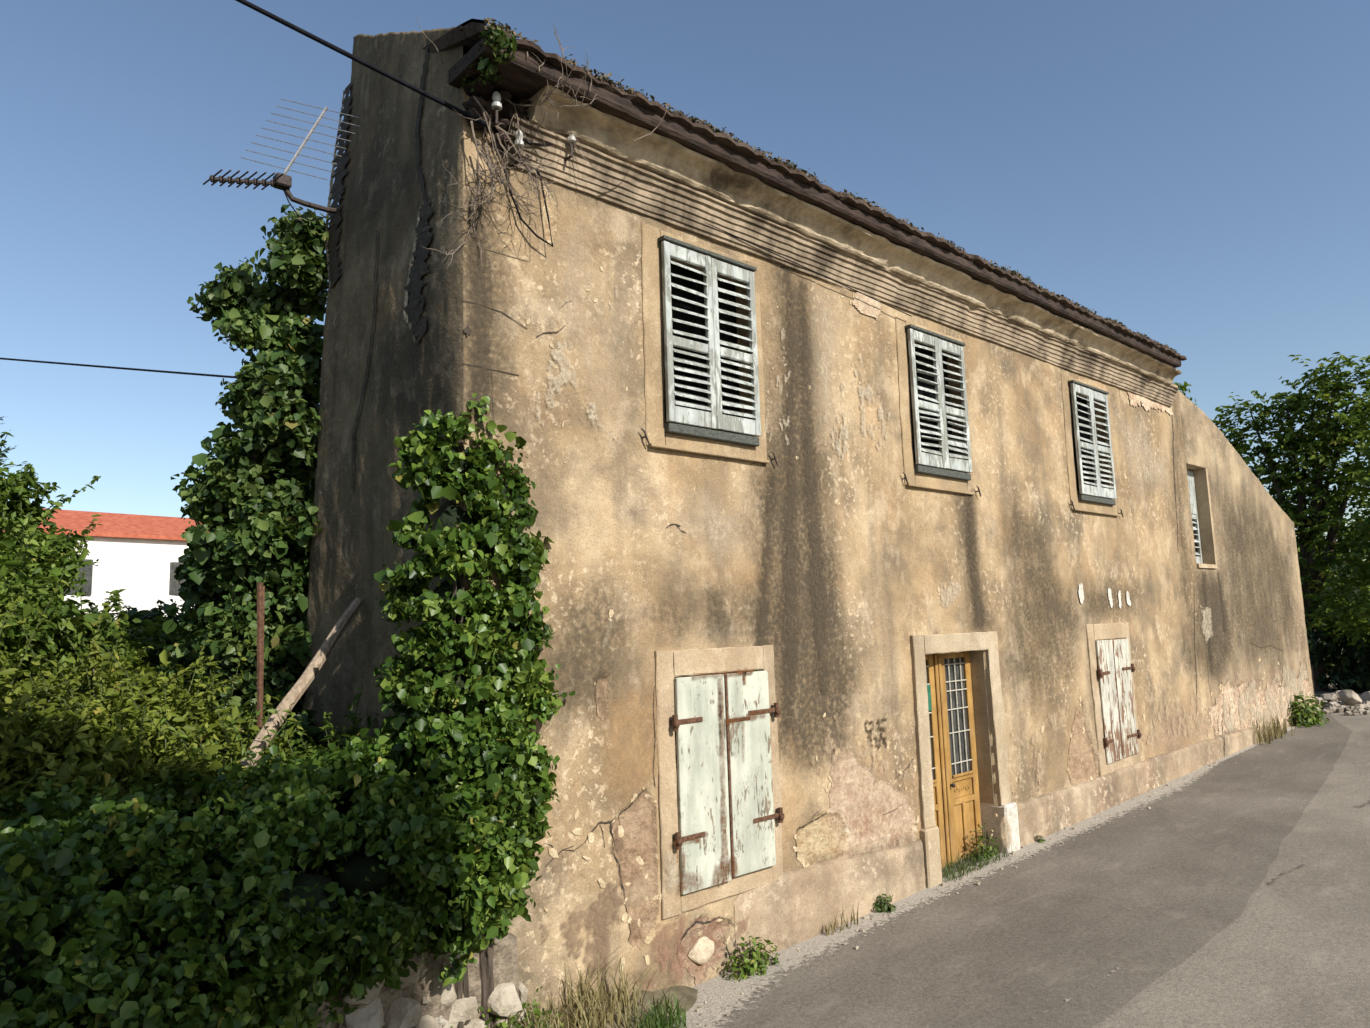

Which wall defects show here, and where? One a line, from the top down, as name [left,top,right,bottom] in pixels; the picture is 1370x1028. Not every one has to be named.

crack [325,82,352,288]
crack [351,36,432,491]
leakage [714,268,853,763]
leakage [550,592,624,707]
crack [545,688,656,934]
spalling [793,713,919,868]
spalling [1142,658,1312,744]